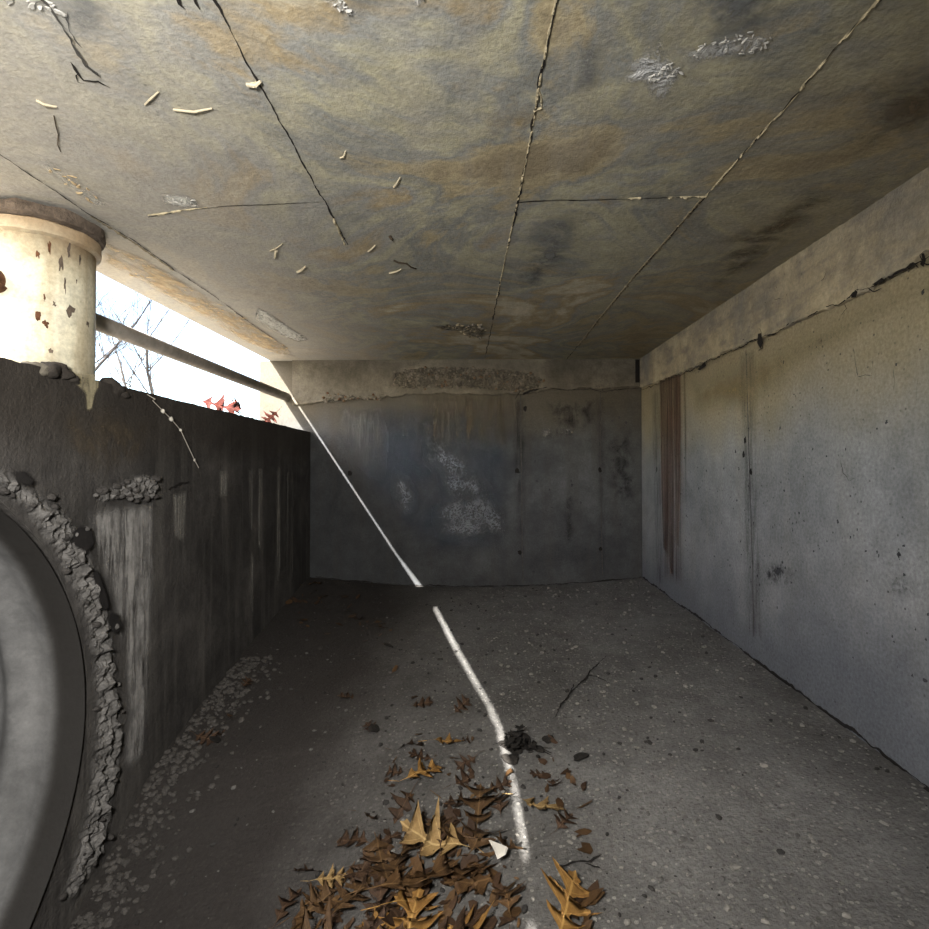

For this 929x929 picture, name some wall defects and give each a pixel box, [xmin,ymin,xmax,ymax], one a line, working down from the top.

crack [66,12,110,88]
peeling [630,51,684,96]
corrosion [36,241,81,294]
spalling [322,366,545,403]
crack [515,252,929,399]
water stain [369,420,501,543]
corrosion [660,374,686,572]
spalling [0,473,161,901]